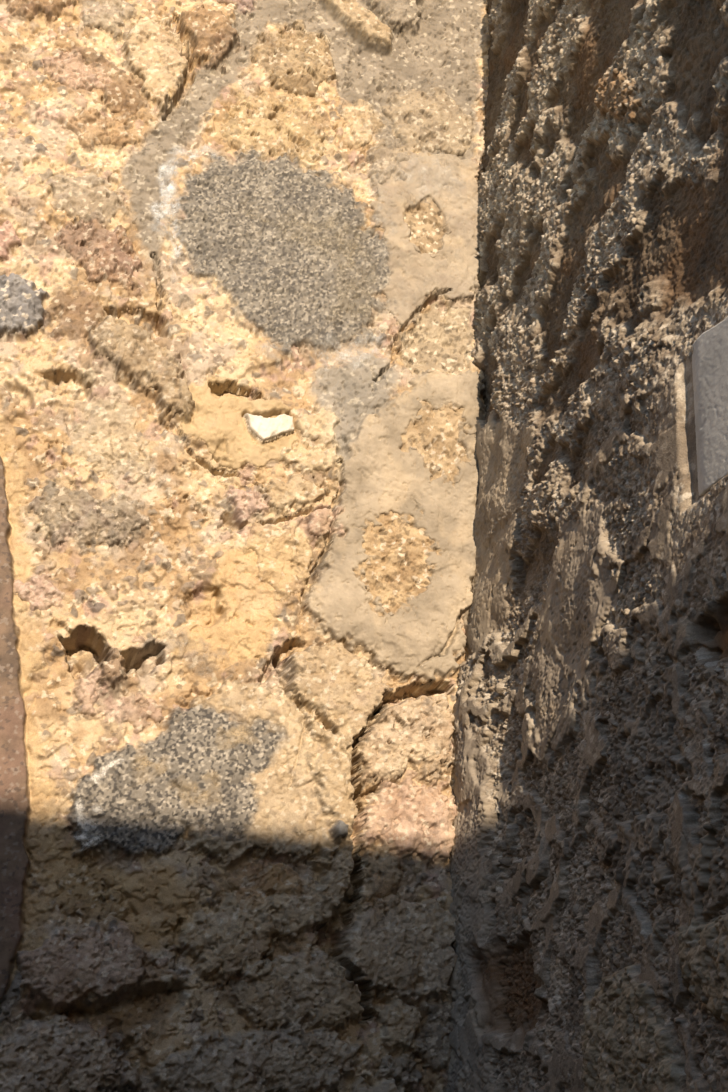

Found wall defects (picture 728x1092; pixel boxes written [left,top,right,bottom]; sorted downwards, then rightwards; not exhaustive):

crack [372,288,451,383]
crack [257,458,345,790]
crack [312,610,463,1024]